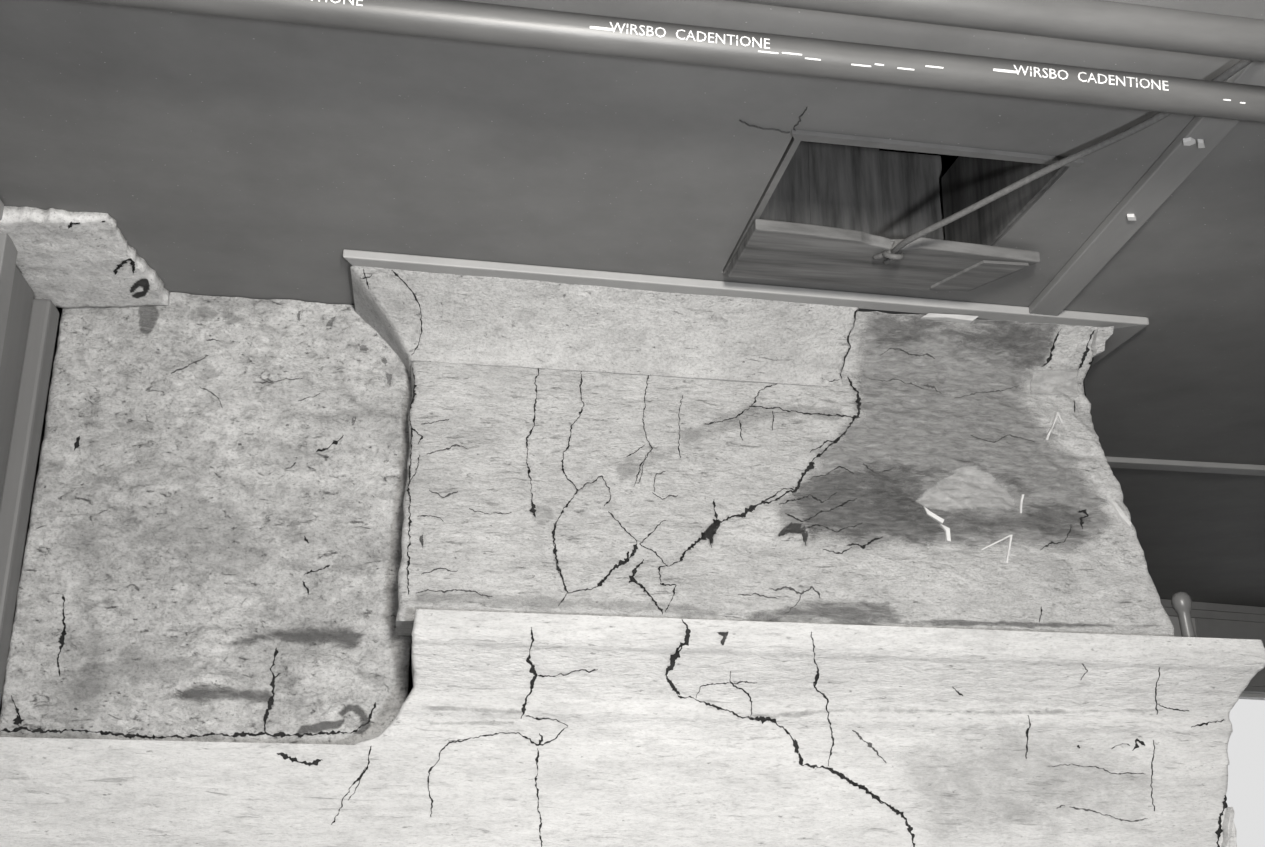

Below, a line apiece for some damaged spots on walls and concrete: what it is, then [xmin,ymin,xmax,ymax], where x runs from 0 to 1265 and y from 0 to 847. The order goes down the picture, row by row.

leakage [880,316,1051,367]
crack [1043,328,1095,412]
crack [971,434,1034,443]
leakage [869,463,1084,536]
crack [1042,509,1089,549]
crack [363,269,1019,847]
leakage [234,629,362,648]
leakage [176,687,272,701]
leakage [298,705,370,734]
crack [1025,667,1224,822]
crack [1215,795,1228,847]